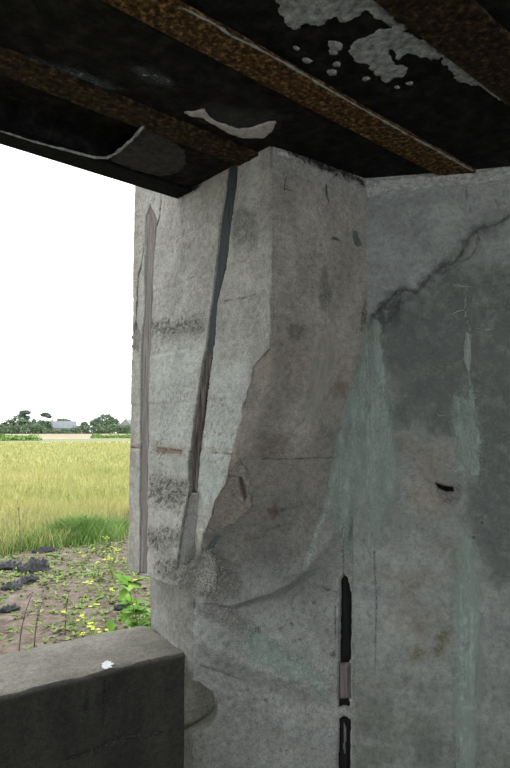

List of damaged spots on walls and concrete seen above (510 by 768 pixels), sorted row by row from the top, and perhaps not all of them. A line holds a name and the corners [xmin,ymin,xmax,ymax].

peeling [276,0,504,102]
peeling [184,106,278,139]
crack [136,199,162,325]
spalling [173,459,253,604]
damp [315,269,510,768]